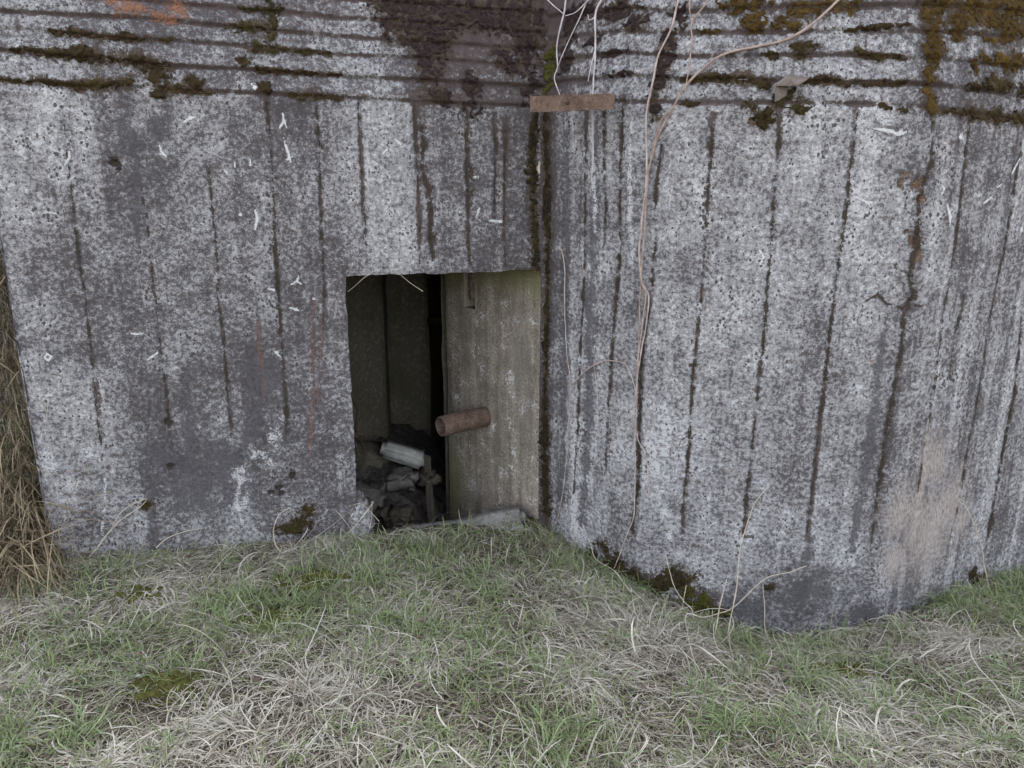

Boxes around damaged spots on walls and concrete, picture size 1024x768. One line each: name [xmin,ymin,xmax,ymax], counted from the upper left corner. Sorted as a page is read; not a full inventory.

corrosion [98,0,190,25]
water stain [110,105,173,254]
crack [866,87,971,549]
water stain [40,458,91,511]
water stain [120,341,288,539]
water stain [702,536,895,633]